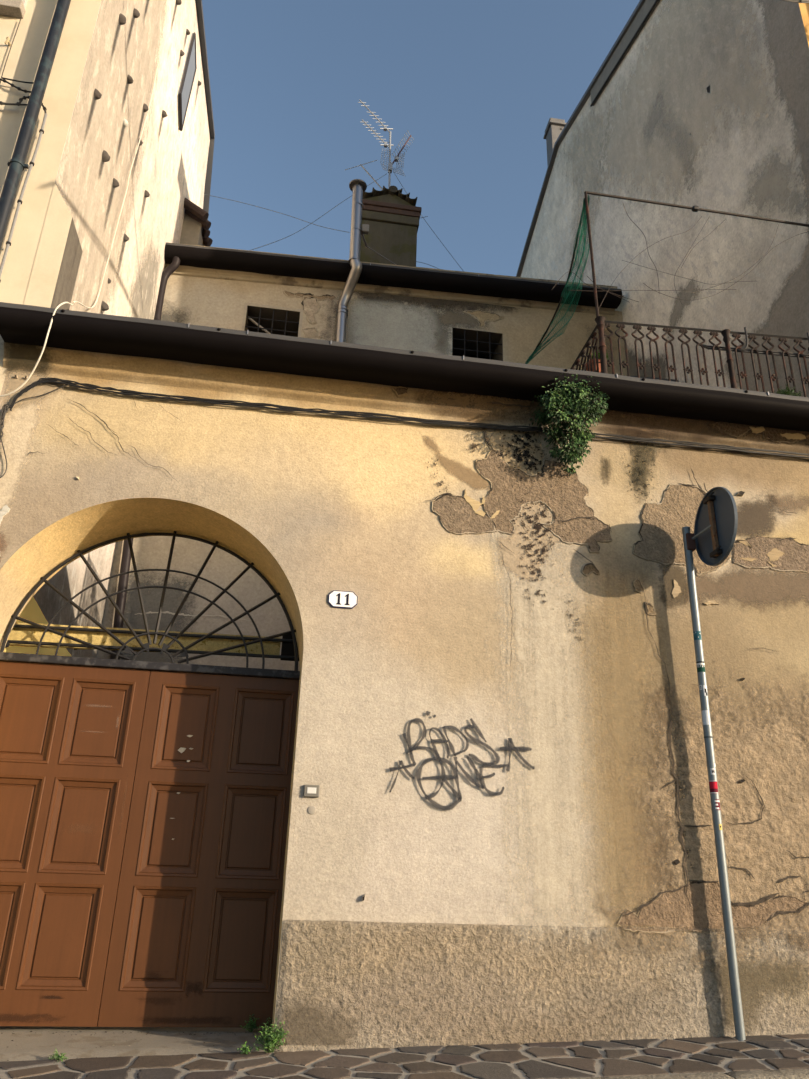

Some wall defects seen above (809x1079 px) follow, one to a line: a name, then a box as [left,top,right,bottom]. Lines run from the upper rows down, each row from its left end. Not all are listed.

damp [55,0,177,314]
damp [131,248,186,323]
damp [668,280,698,338]
crack [28,399,177,481]
spalling [431,428,613,577]
damp [602,441,666,502]
spalling [632,484,809,576]
peeling [671,580,681,598]
crack [622,580,809,923]